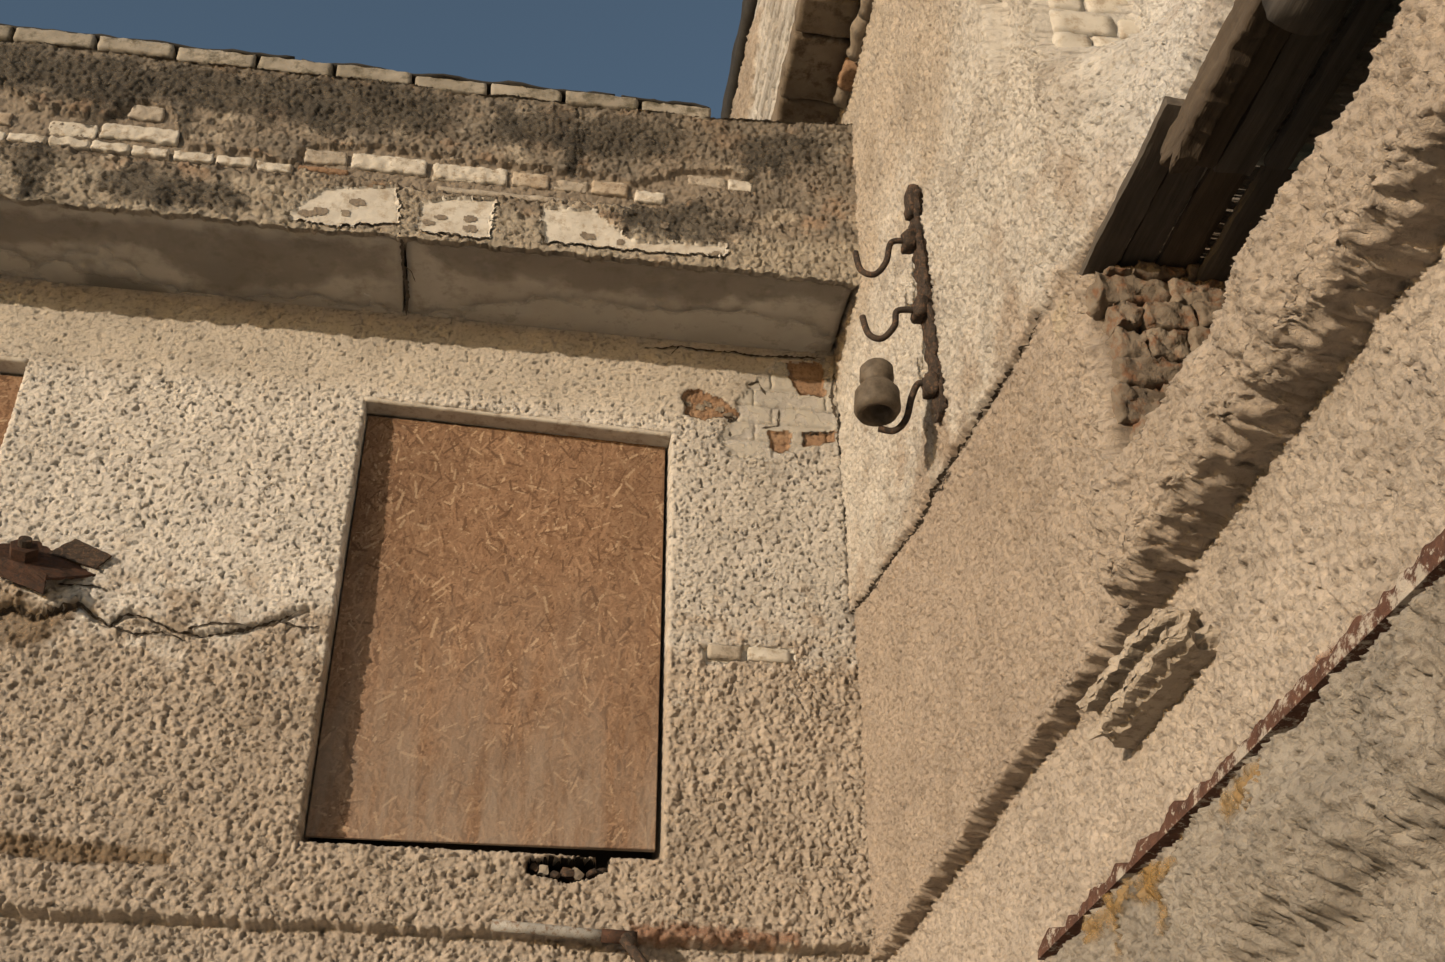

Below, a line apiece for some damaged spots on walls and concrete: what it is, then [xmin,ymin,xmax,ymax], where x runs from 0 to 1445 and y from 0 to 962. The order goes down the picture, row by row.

damp [179,95,200,141]
spalling [0,82,757,257]
crack [399,230,415,314]
peeling [682,359,838,460]
crack [851,302,1052,628]
crack [0,583,320,641]
rust [1220,764,1261,814]
hole [527,856,610,884]
rust [1081,840,1182,949]